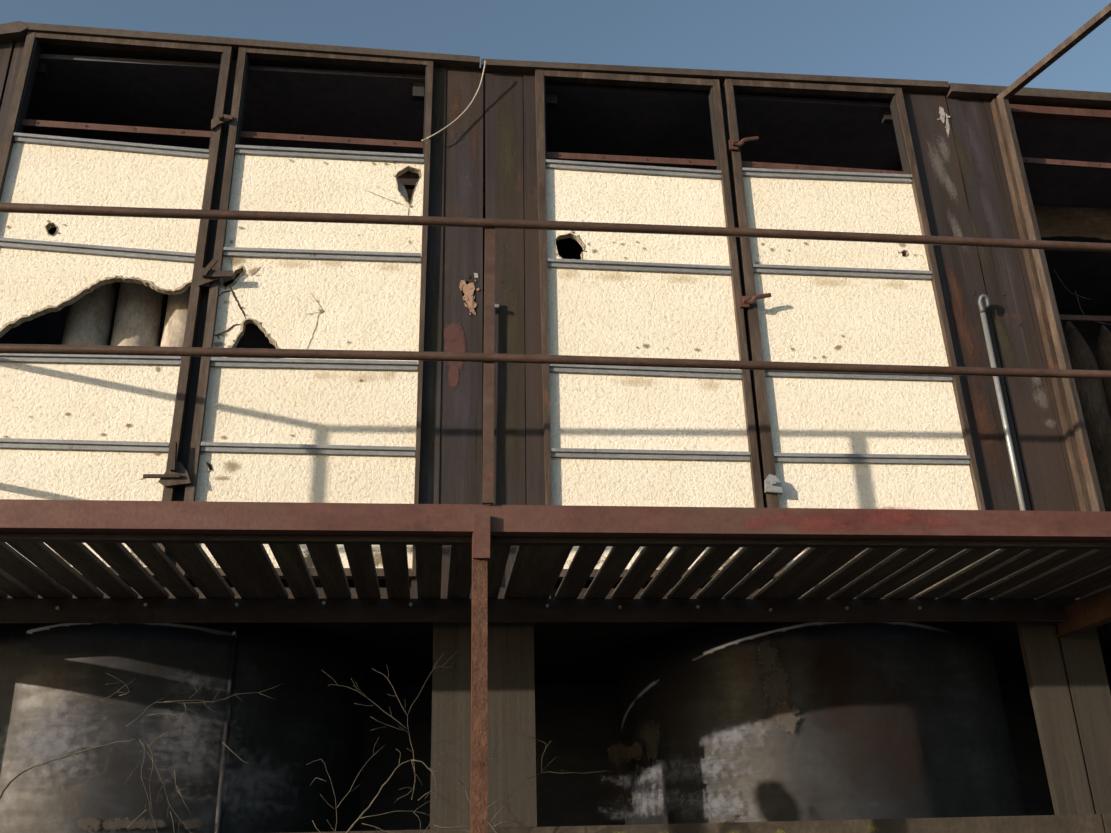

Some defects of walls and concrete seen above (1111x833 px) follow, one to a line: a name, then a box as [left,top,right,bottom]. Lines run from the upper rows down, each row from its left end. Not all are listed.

peeling [459,273,479,315]
corrosion [444,322,466,388]